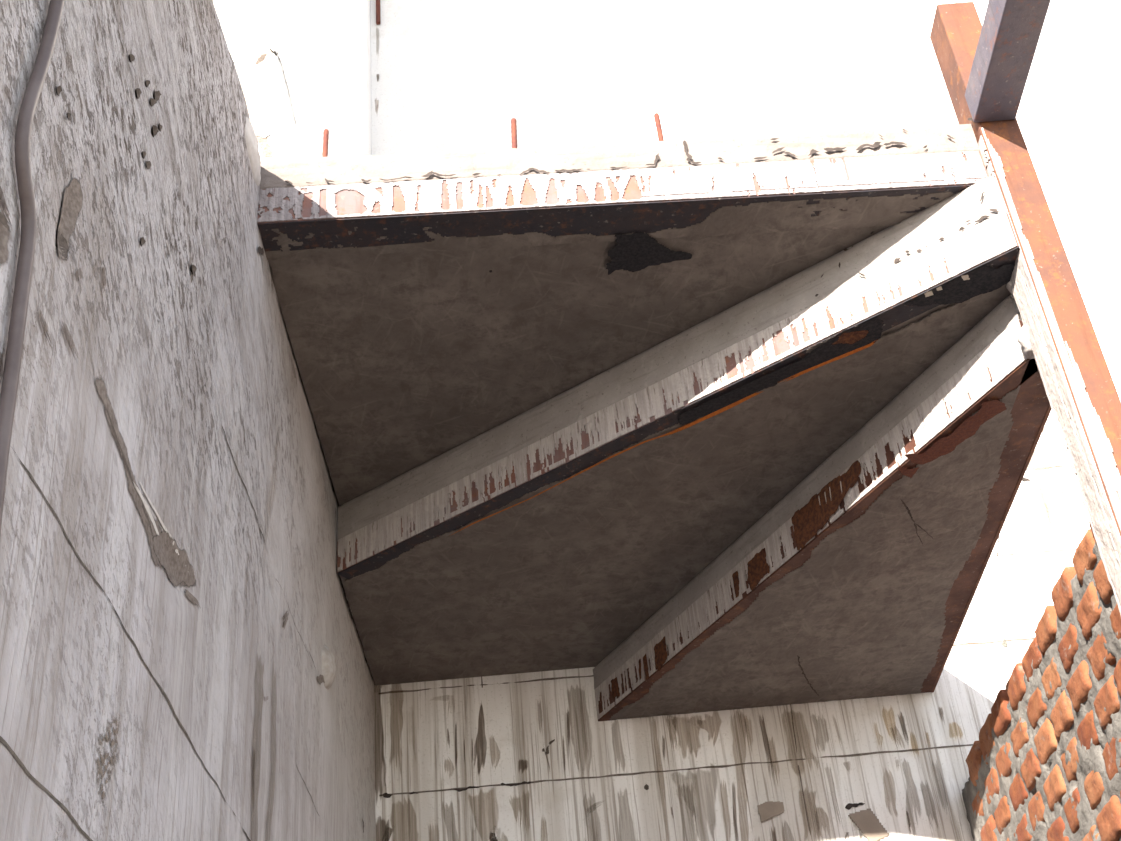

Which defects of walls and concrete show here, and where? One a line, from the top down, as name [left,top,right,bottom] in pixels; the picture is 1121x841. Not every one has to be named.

spalling [241,48,276,158]
spalling [0,210,11,264]
spalling [55,178,83,260]
spalling [606,232,692,275]
spalling [678,319,884,425]
spalling [791,460,861,550]
spalling [732,548,770,597]
spalling [638,636,667,681]
spalling [611,677,620,698]